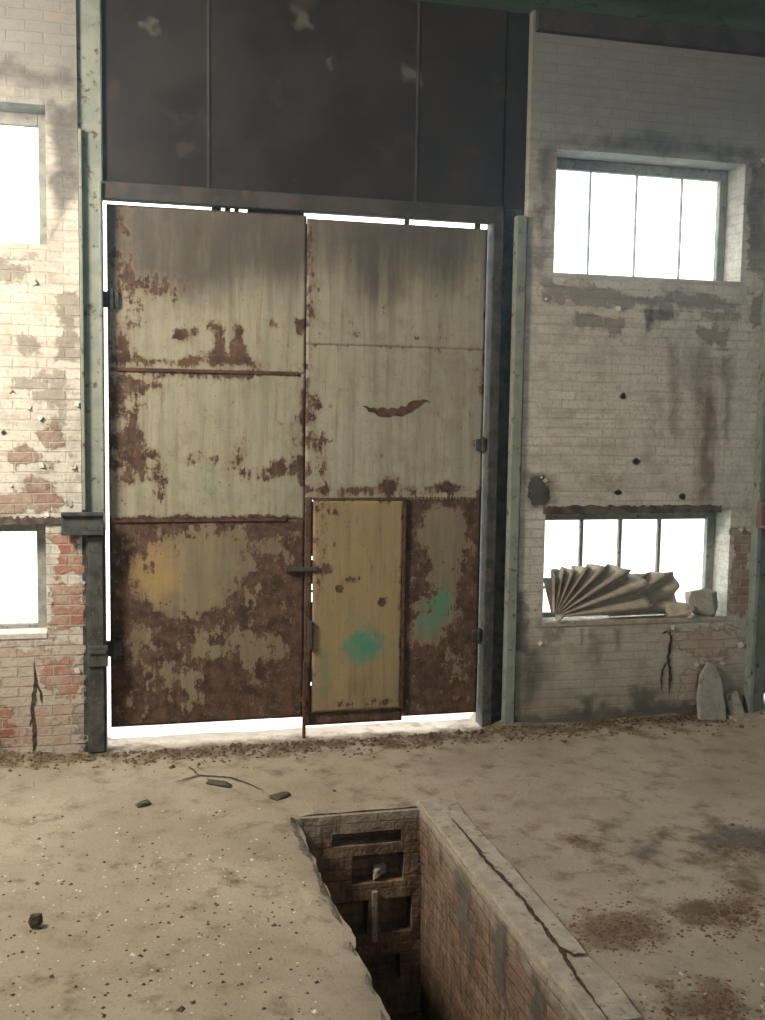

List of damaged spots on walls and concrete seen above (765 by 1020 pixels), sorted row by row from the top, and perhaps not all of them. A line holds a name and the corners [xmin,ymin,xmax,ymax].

spalling [0,404,88,753]
crack [660,627,673,692]
crack [29,665,42,751]